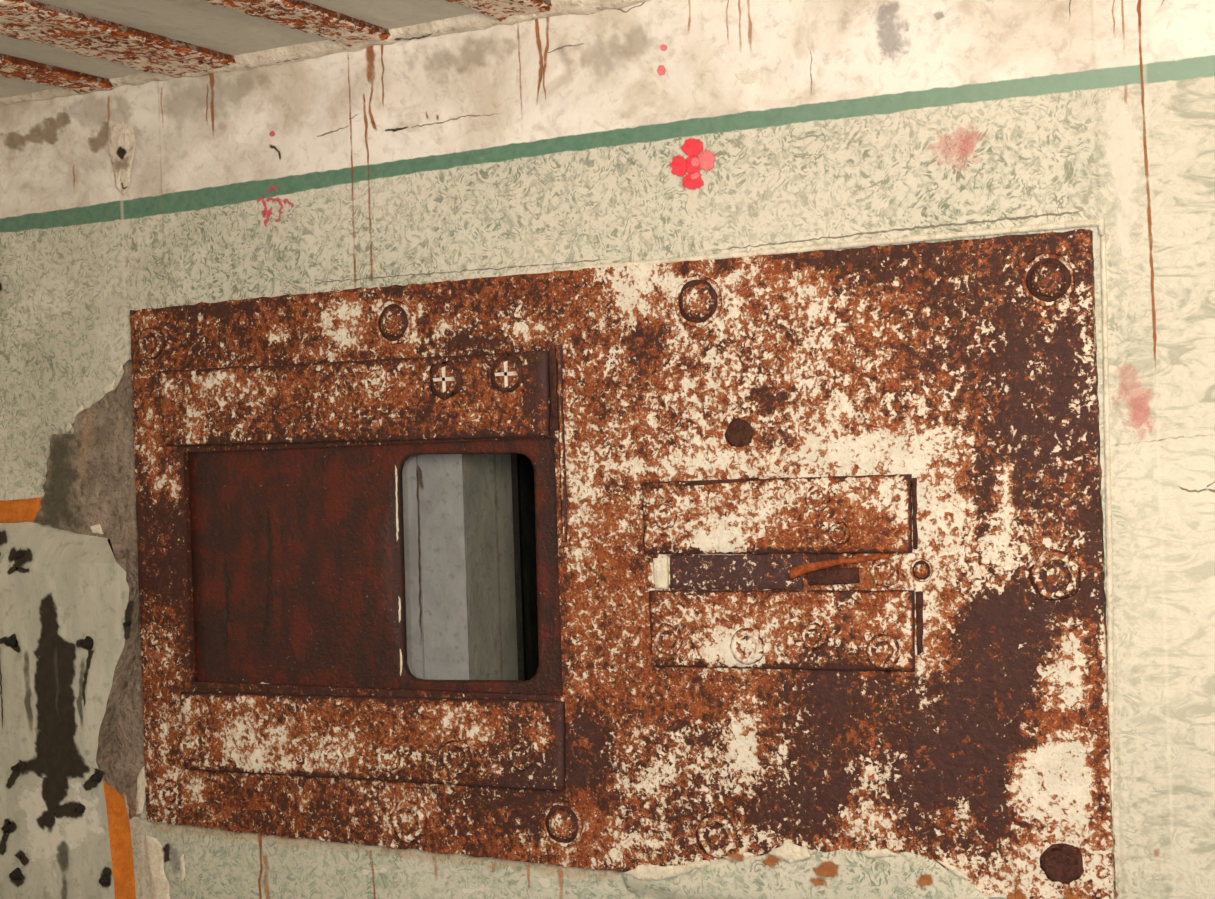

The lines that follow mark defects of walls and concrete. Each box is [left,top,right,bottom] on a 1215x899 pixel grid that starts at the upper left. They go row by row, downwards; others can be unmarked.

corrosion [535,17,549,98]
corrosion [348,45,384,282]
corrosion [1112,0,1156,358]
spalling [34,360,138,572]
crack [1180,482,1215,493]
water stain [24,654,32,721]
spalling [110,619,146,819]
water stain [18,781,105,899]
flaking render [145,835,186,899]
corrosion [810,861,838,885]
corrosion [917,874,932,886]
corrosion [1007,876,1027,899]